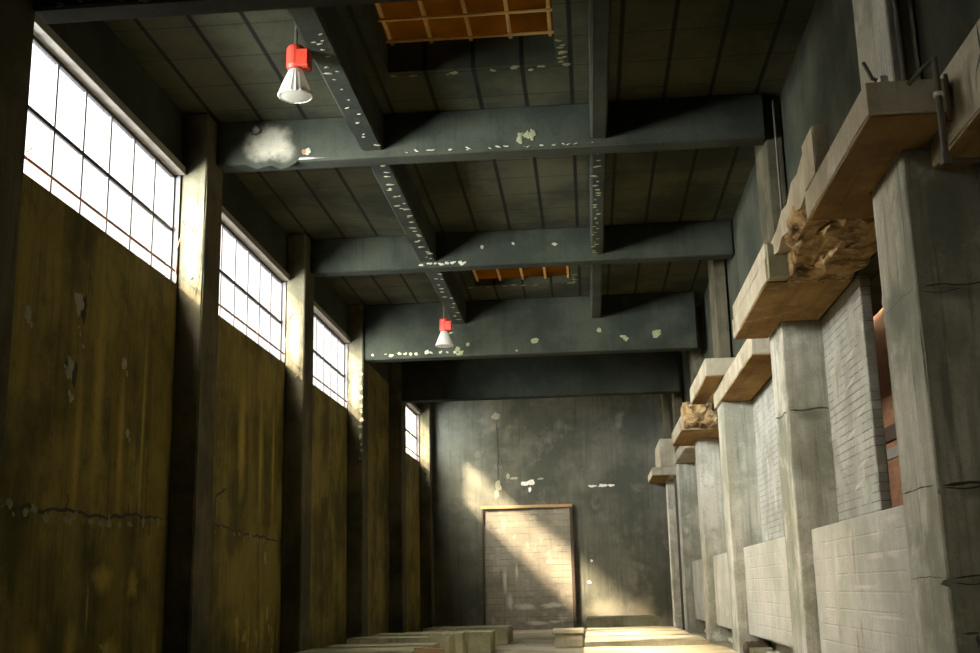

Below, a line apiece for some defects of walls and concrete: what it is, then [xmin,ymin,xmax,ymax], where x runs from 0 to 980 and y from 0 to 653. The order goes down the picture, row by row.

damp [234,119,335,169]
spalling [488,129,577,149]
crack [776,401,830,441]
crack [904,476,980,505]
crack [0,493,167,536]
crack [915,571,980,597]